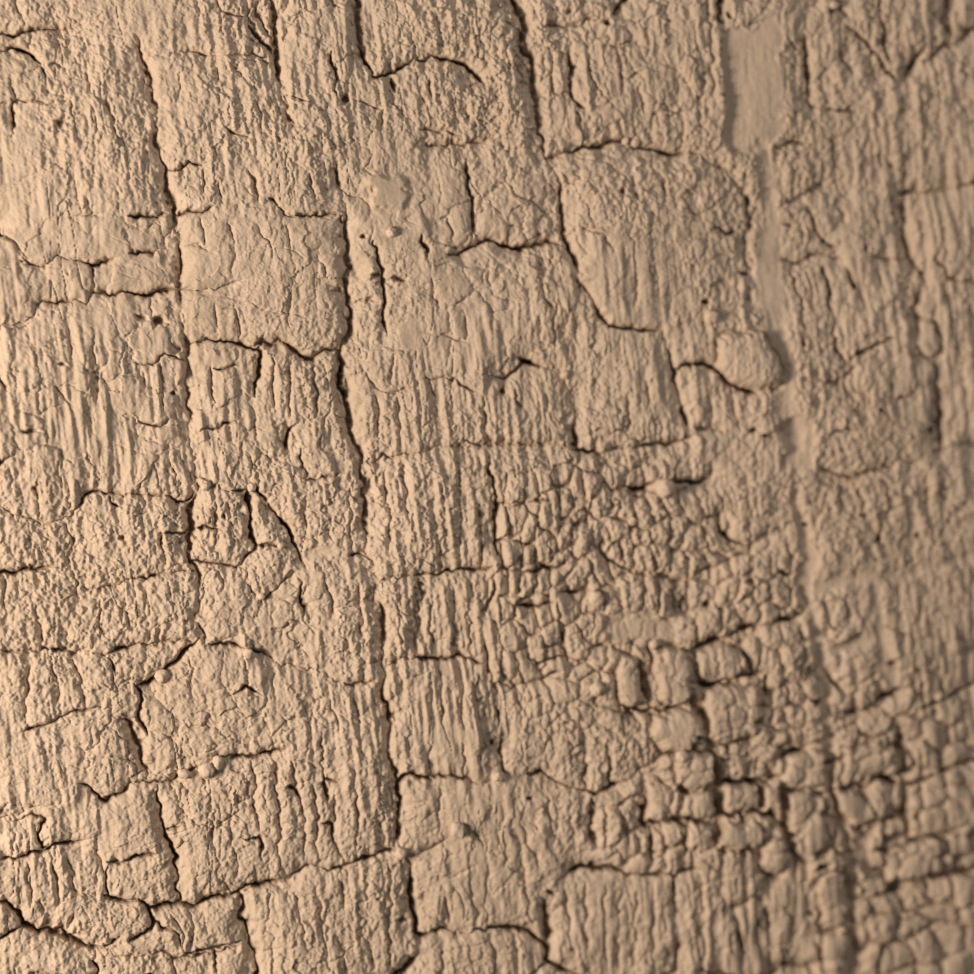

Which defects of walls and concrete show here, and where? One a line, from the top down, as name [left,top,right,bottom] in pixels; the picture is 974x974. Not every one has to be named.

crack [773,0,974,481]
crack [0,0,759,974]
crack [597,506,791,611]
crack [527,569,808,923]
crack [822,666,903,722]
crack [843,682,974,894]
crack [699,895,774,974]
crack [768,961,819,974]
crack [818,881,854,974]